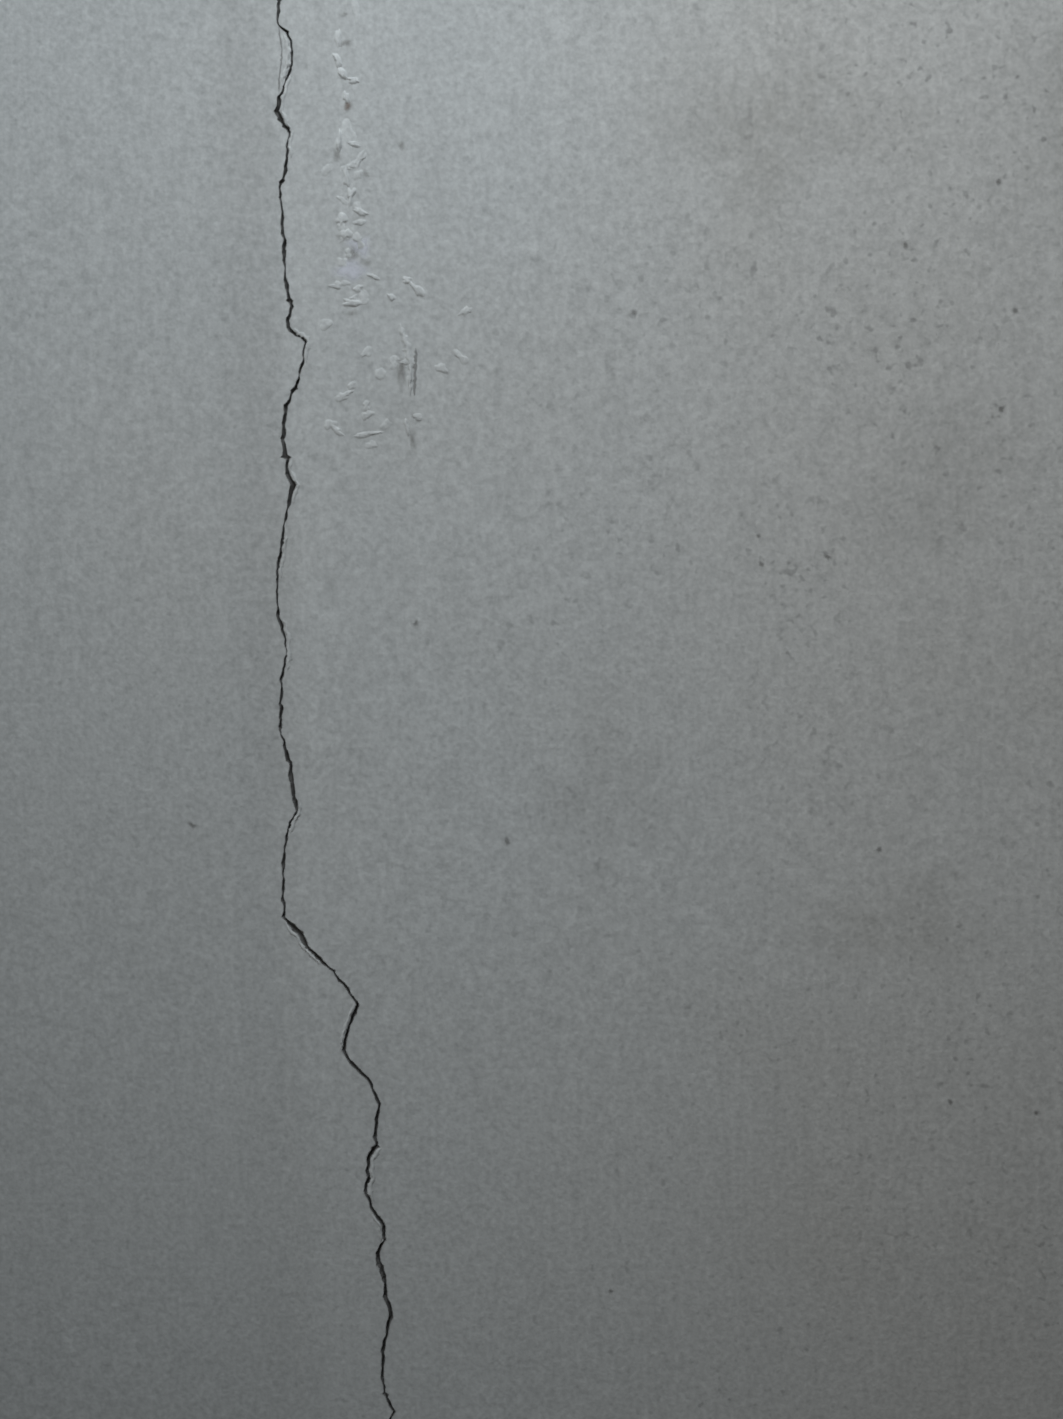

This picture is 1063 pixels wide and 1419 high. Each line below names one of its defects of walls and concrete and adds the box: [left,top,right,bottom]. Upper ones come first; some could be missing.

crack [274,0,396,1419]